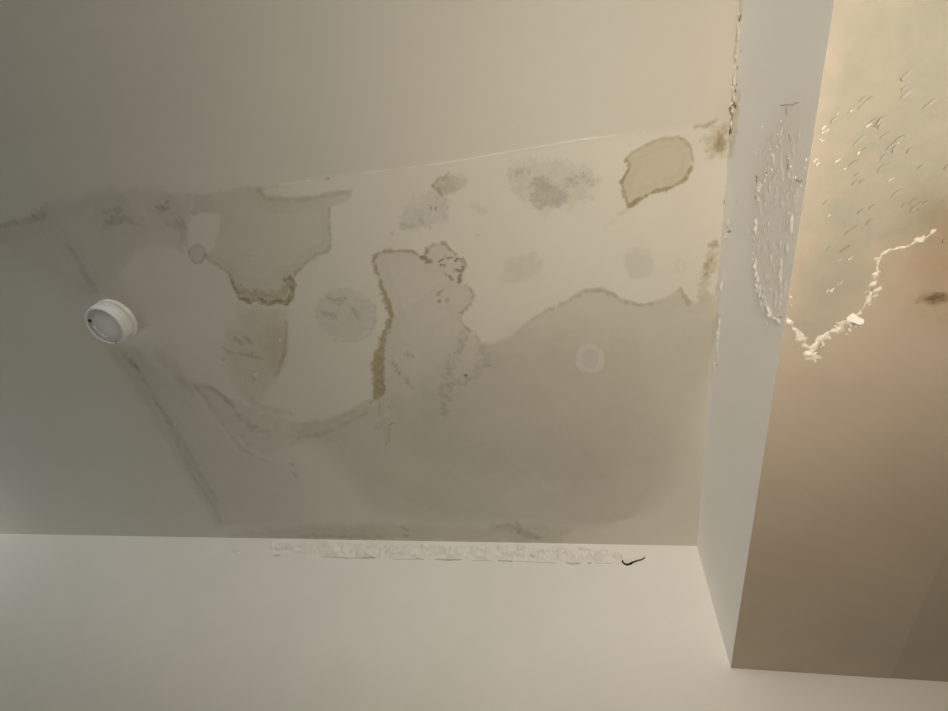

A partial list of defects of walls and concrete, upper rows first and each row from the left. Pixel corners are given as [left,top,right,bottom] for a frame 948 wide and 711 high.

peeling [726,0,743,164]